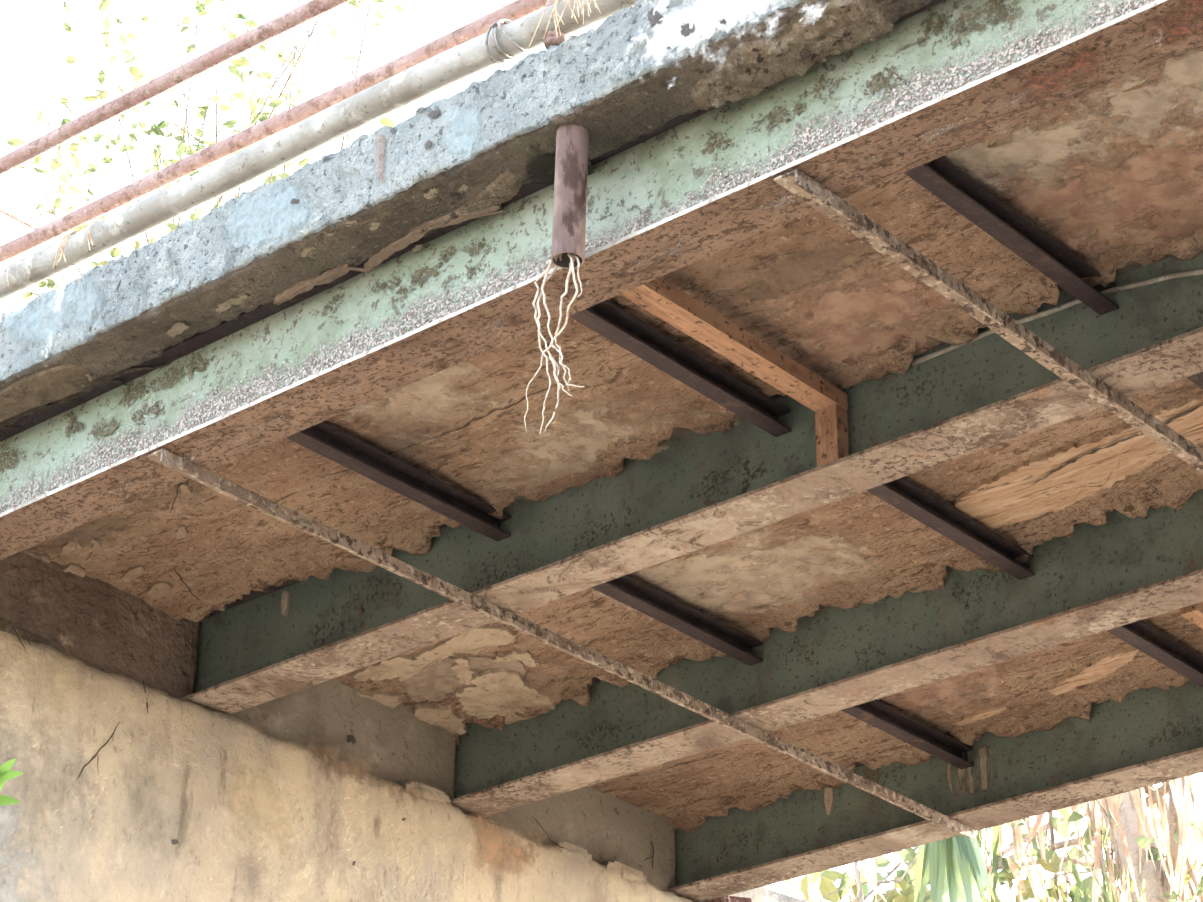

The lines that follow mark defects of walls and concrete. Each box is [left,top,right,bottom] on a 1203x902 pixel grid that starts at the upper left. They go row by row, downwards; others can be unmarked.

spalling [691,0,894,112]
rust [585,0,1156,254]
rust [1006,119,1203,269]
water stain [0,271,101,357]
rust [0,237,555,512]
spalling [352,625,556,735]
rust [880,665,1005,716]